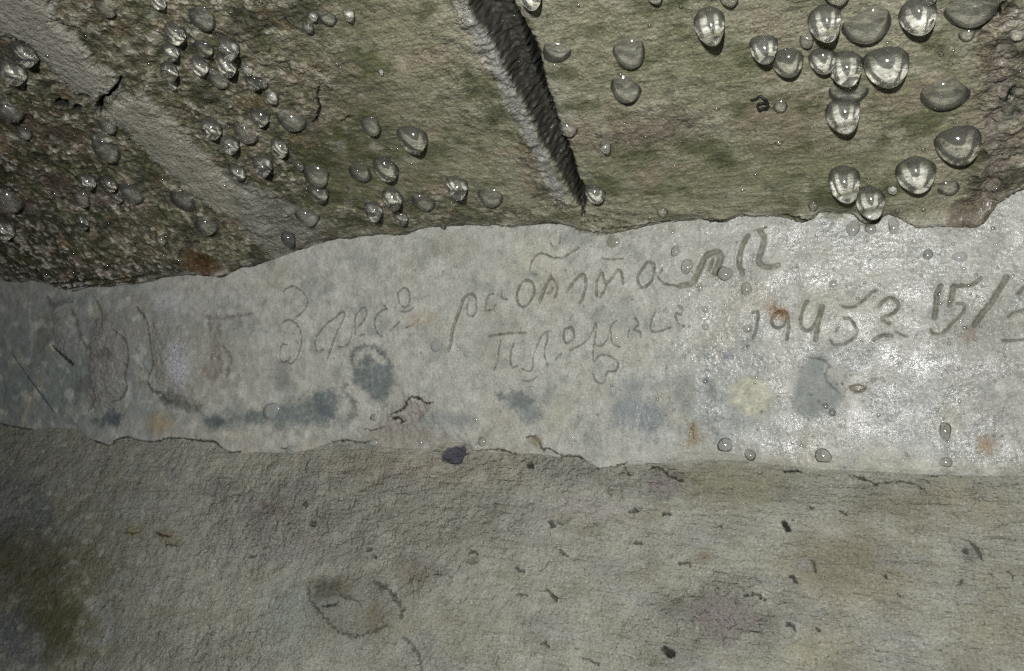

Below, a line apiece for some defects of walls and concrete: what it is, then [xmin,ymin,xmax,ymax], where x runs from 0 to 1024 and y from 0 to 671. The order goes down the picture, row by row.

crack [468,0,660,229]
leakage [162,344,393,426]
leakage [794,357,841,418]